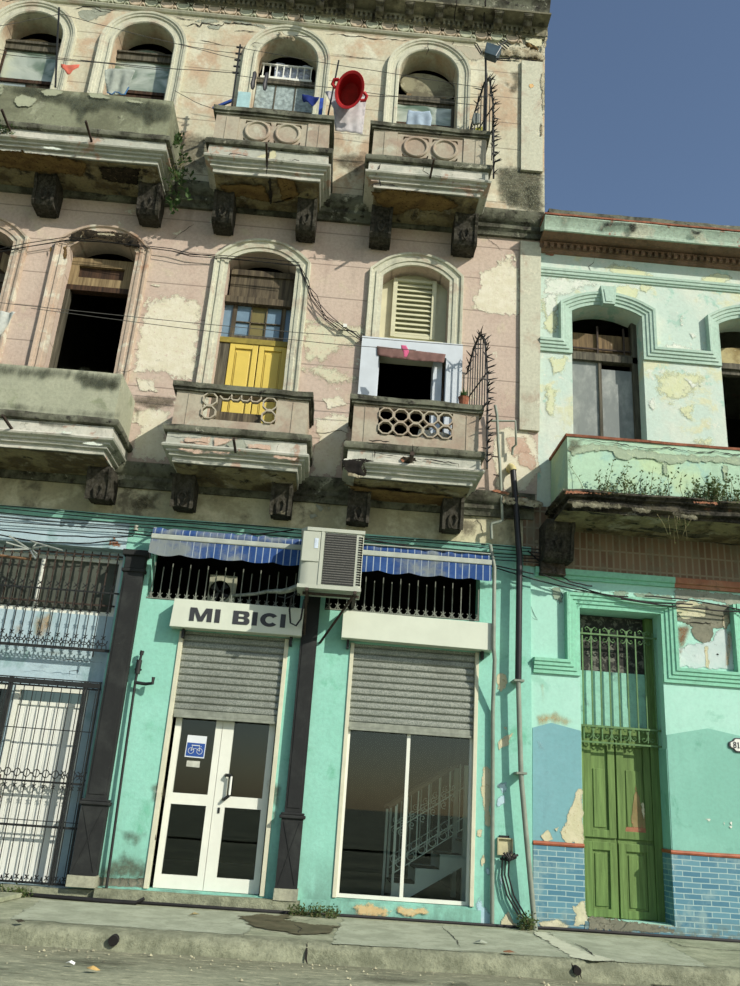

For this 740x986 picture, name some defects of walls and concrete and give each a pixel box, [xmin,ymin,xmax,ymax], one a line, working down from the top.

peeling [14,89,63,107]
water stain [15,86,171,122]
water stain [499,168,543,212]
peeling [471,254,520,318]
peeling [133,283,202,393]
water stain [67,372,120,388]
peeling [131,407,172,463]
peeling [491,427,543,509]
peeling [614,588,740,670]
peeling [477,767,507,837]
peeling [541,789,584,844]
peeling [354,903,428,916]